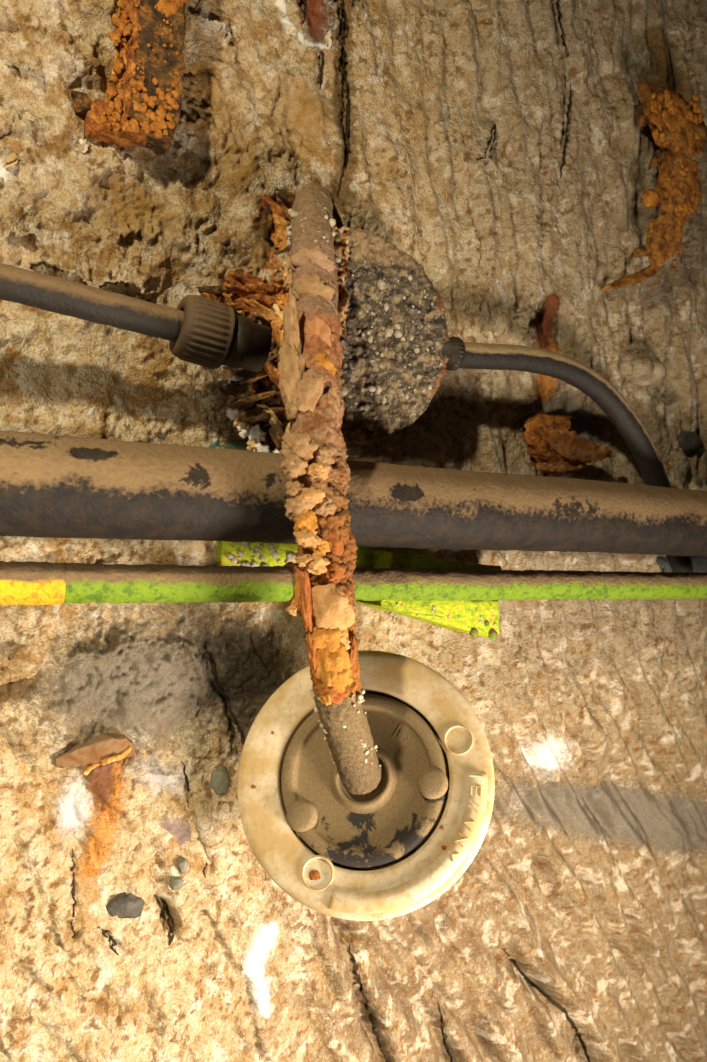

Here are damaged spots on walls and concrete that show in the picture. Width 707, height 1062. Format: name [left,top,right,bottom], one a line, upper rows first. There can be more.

rust [71,0,189,156]
rust [535,374,557,404]
rust [532,293,562,353]
rust [74,746,133,887]